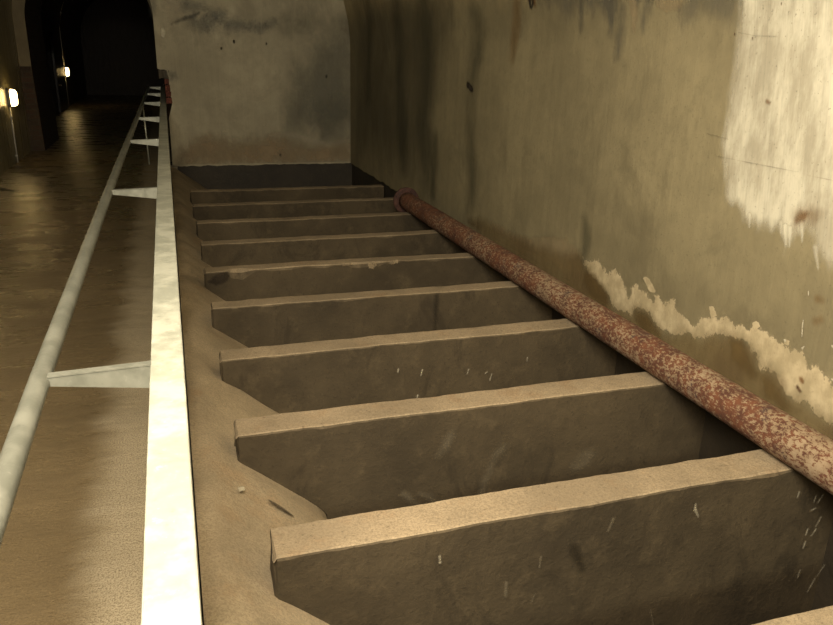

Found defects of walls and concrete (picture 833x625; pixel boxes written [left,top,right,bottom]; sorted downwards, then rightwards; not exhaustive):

spalling [352,164,397,198]
peeling [525,239,833,425]
spalling [698,411,763,460]
spalling [811,522,833,610]